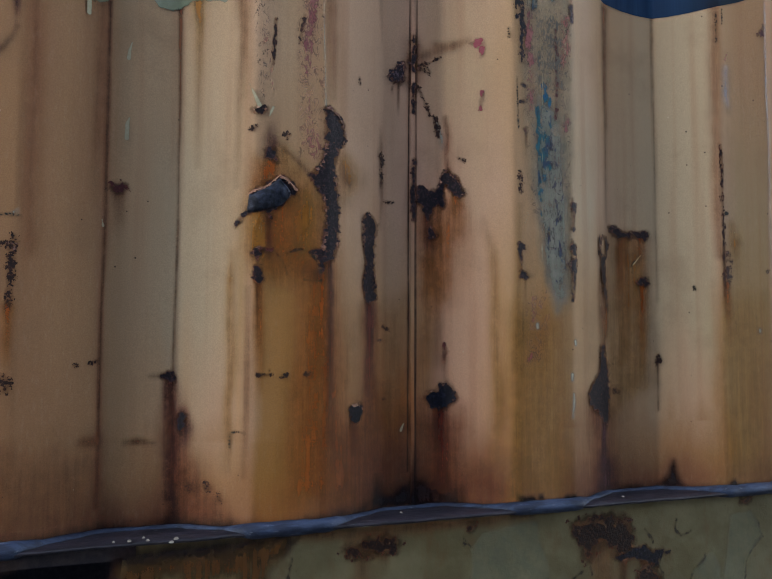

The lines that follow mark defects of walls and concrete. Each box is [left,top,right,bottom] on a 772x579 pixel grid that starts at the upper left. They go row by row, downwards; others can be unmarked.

peeling [513,0,527,63]
corrosion [0,231,20,346]
corrosion [306,1,462,519]
peeling [517,241,529,280]
corrosion [598,234,609,341]
corrosion [337,533,406,569]
corrosion [565,511,662,579]